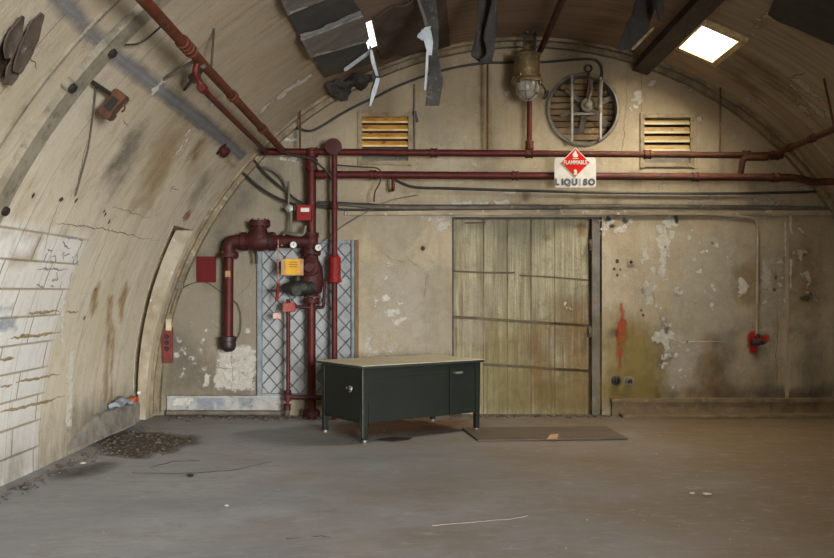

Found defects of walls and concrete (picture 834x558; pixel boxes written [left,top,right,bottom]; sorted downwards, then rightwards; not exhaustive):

crack [44,144,158,278]
peeling [632,215,690,369]
peeling [737,277,749,297]